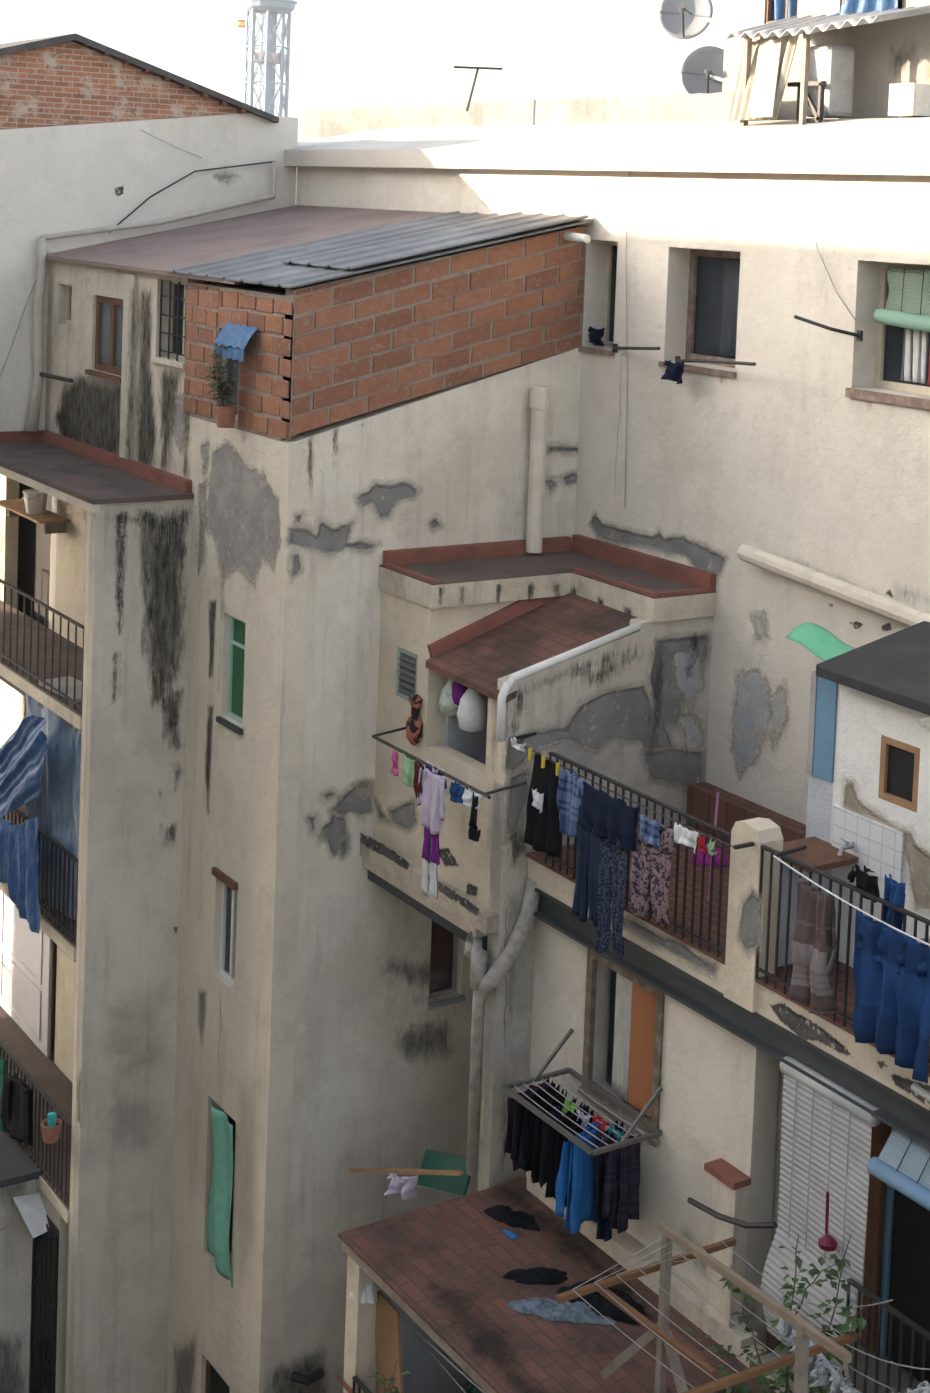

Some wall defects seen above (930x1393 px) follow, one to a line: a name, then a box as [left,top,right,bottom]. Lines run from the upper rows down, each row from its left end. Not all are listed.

leakage [57,292,189,473]
peeling [197,442,419,584]
peeling [590,515,726,575]
leakage [115,512,187,748]
peeling [505,634,710,837]
peeling [307,781,416,869]
peeling [440,848,458,866]
spalling [429,877,479,916]